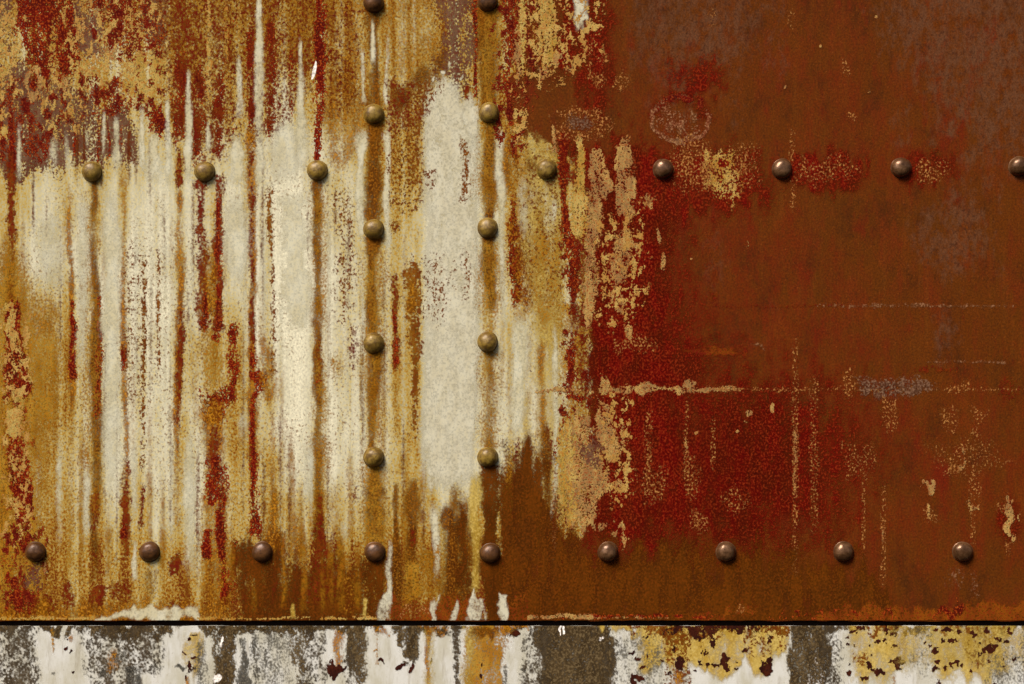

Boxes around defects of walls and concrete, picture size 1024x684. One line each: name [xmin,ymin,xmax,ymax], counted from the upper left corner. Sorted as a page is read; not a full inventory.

corrosion [0,0,544,684]
peeling [326,659,346,681]
peeling [489,0,666,552]
corrosion [547,0,619,124]
corrosion [461,116,1024,684]